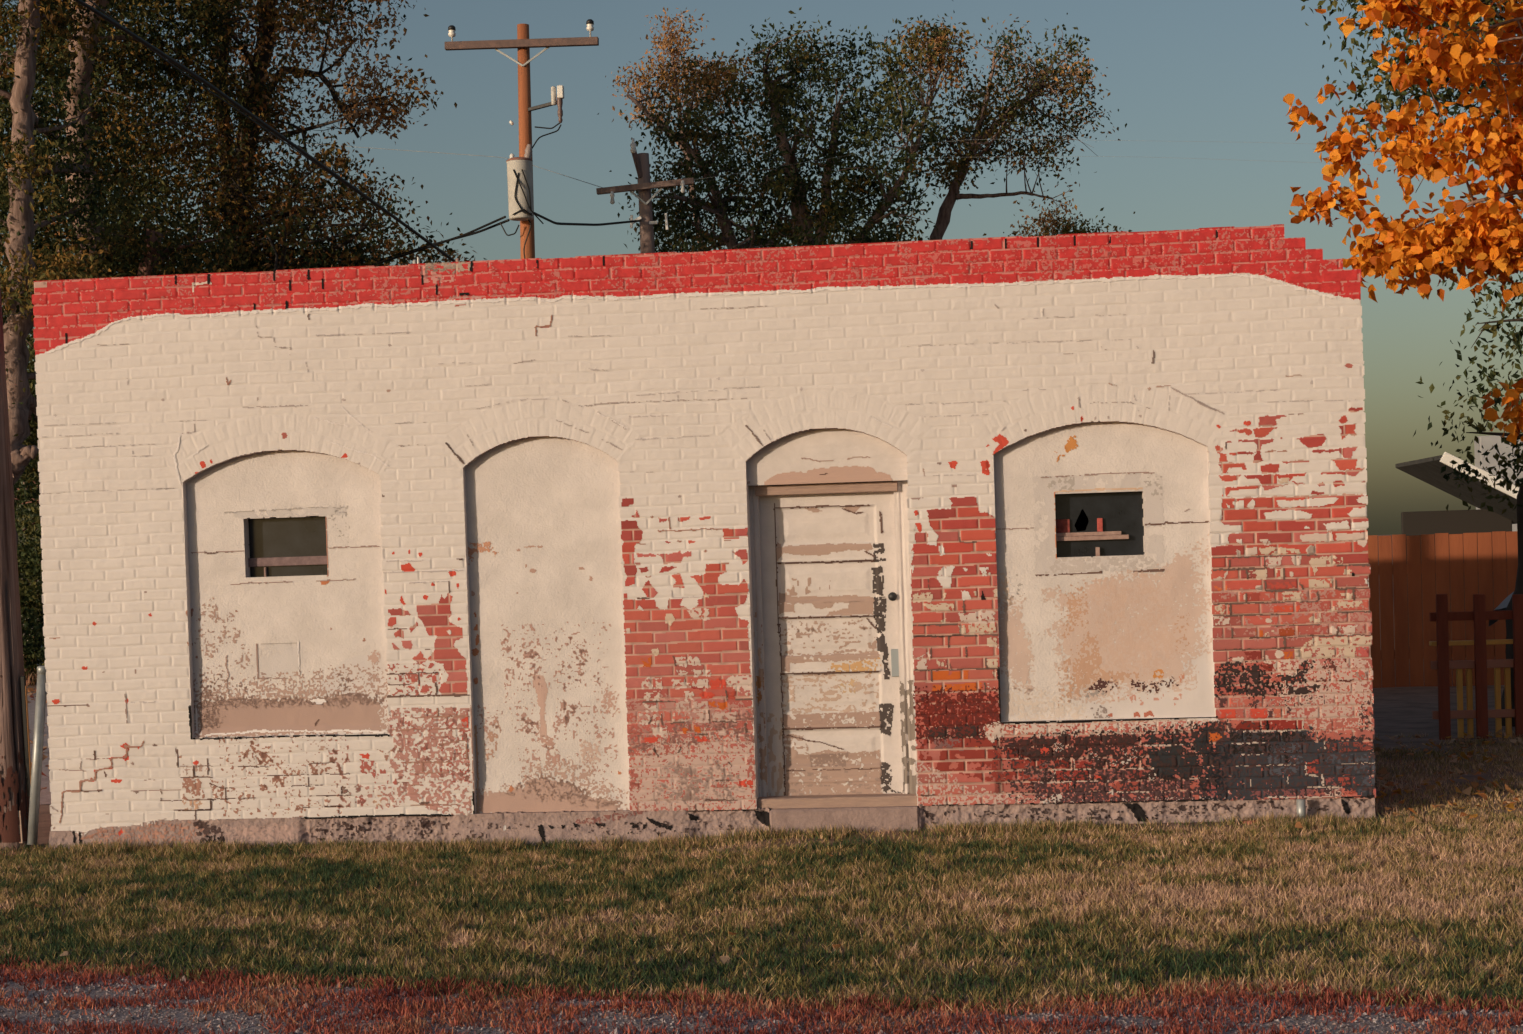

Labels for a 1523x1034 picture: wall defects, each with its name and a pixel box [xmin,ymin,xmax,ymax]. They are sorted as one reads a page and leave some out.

damp [915,534,1374,806]